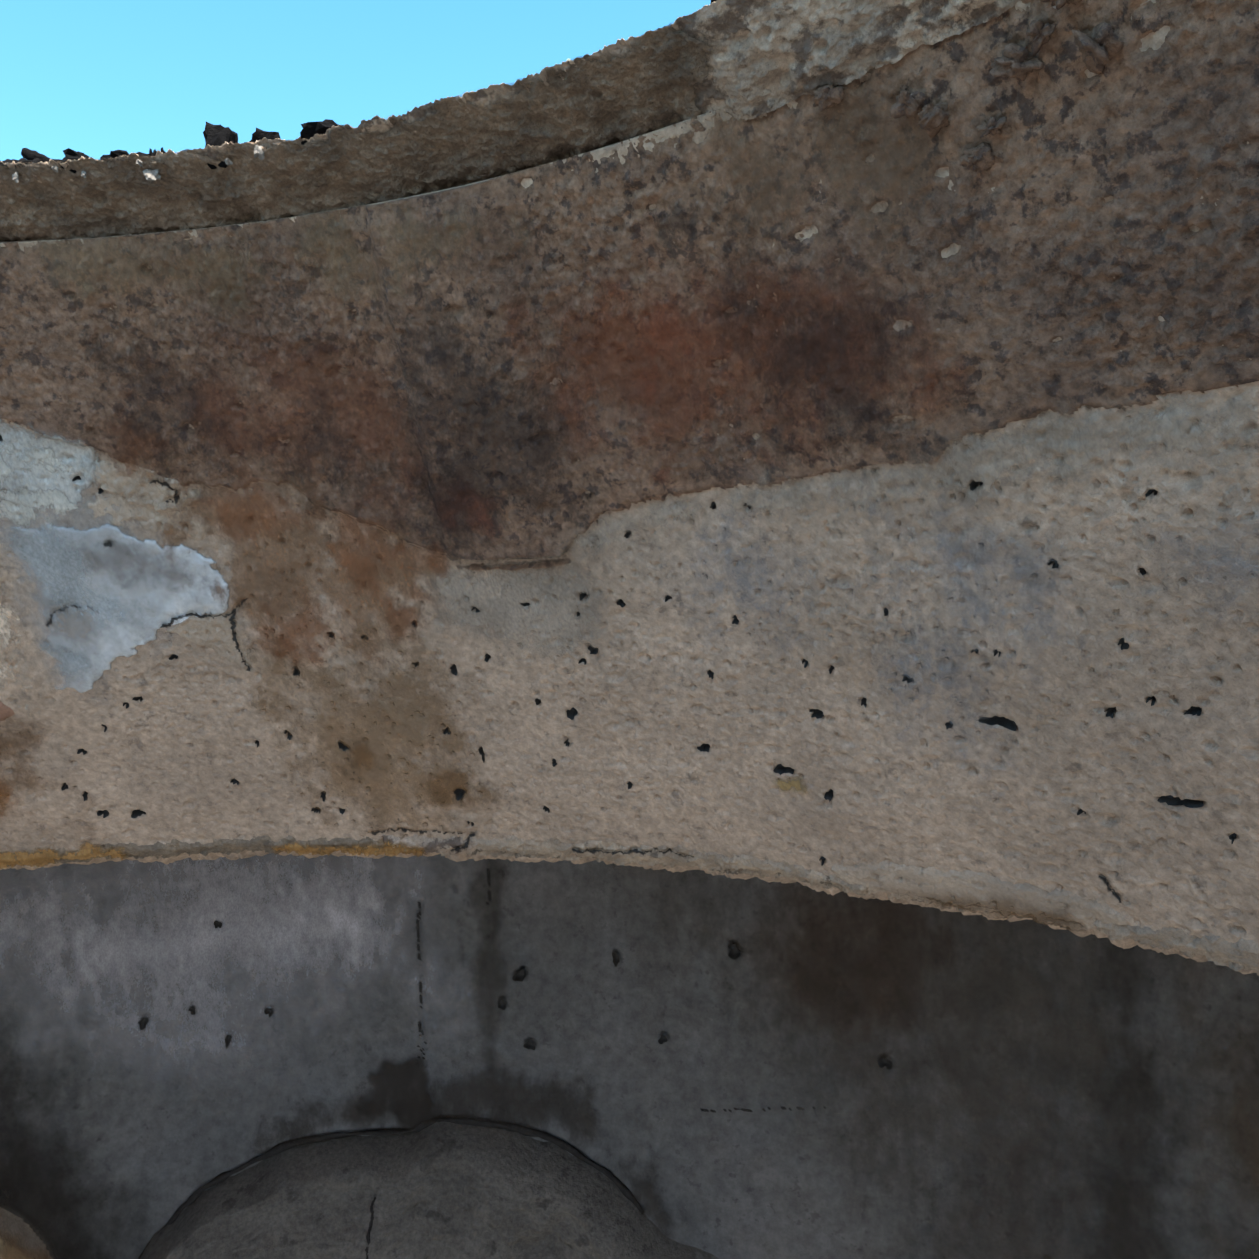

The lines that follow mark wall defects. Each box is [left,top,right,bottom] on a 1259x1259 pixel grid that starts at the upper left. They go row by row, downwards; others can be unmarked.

peeling [0,0,1259,693]
leakage [0,419,99,529]
leakage [0,588,22,681]